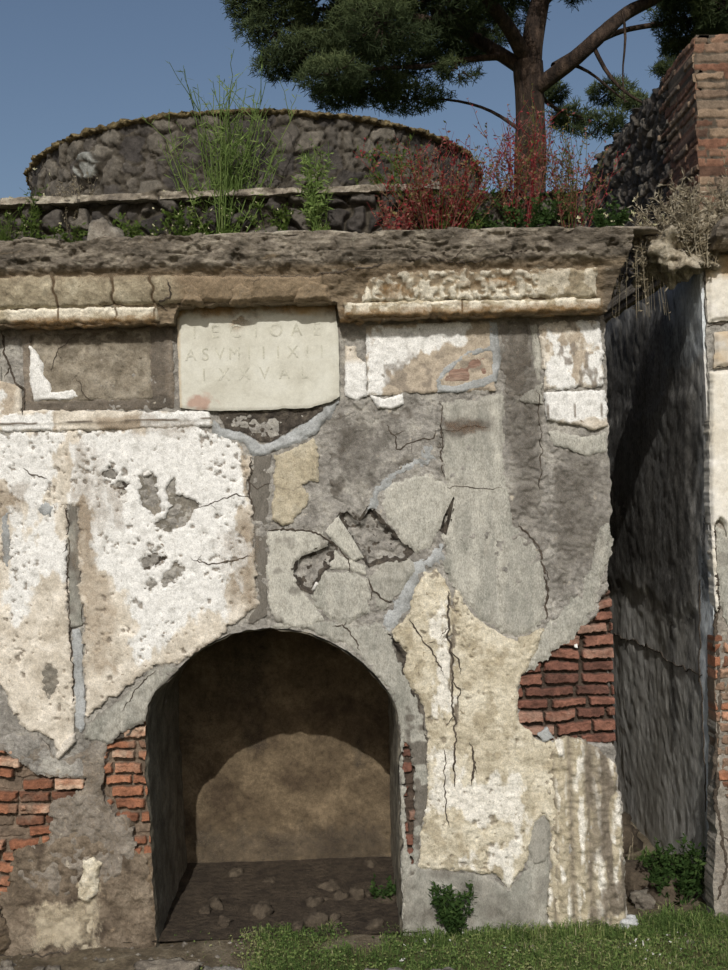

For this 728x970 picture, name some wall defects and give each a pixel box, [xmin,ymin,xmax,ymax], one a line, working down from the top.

flaking render [101,467,199,532]
crack [193,457,392,603]
flaking render [291,541,338,594]
flaking render [337,506,414,568]
crack [387,401,499,490]
crack [512,518,550,621]
leakage [605,303,708,606]
crack [409,591,477,825]
flaking render [517,590,616,744]
crack [613,525,728,900]
flaking render [0,751,86,895]
flaking render [103,721,152,854]